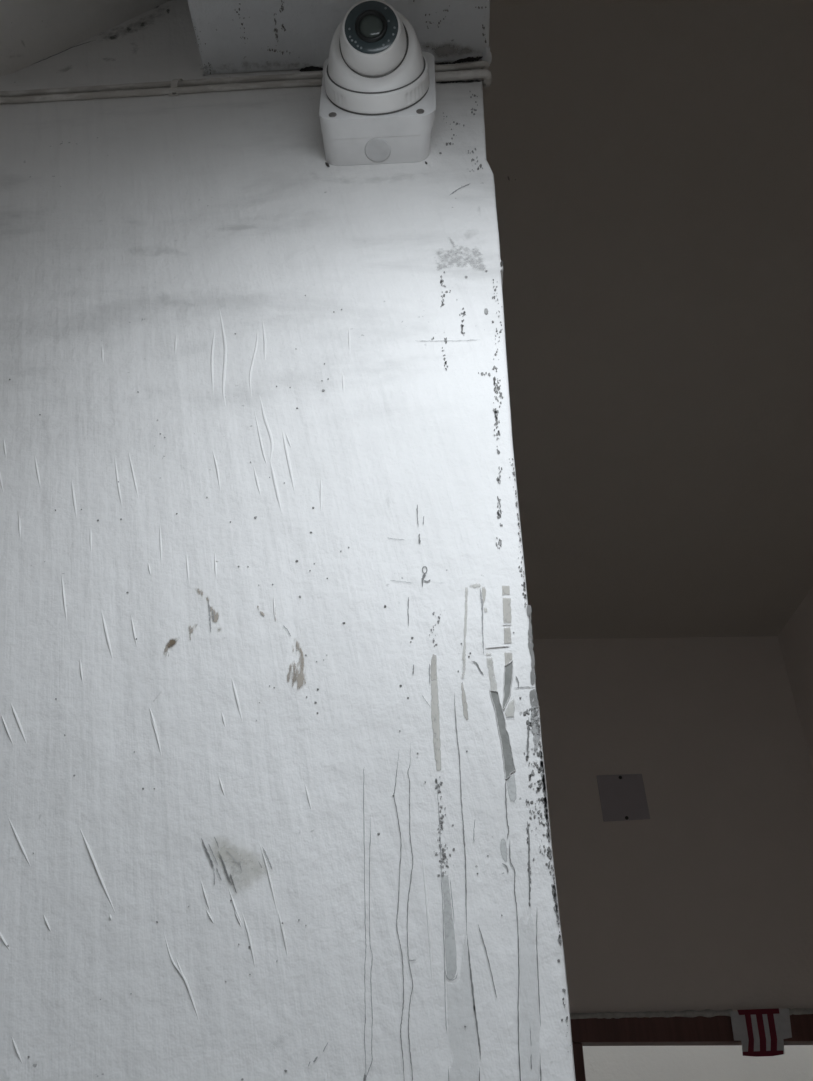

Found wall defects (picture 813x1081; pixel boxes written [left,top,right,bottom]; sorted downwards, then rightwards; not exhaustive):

peeling [458,270,562,944]
leakage [201,837,242,893]
crack [363,770,373,1081]
crack [393,749,413,1080]
peeling [425,612,458,980]
crack [413,664,481,1081]